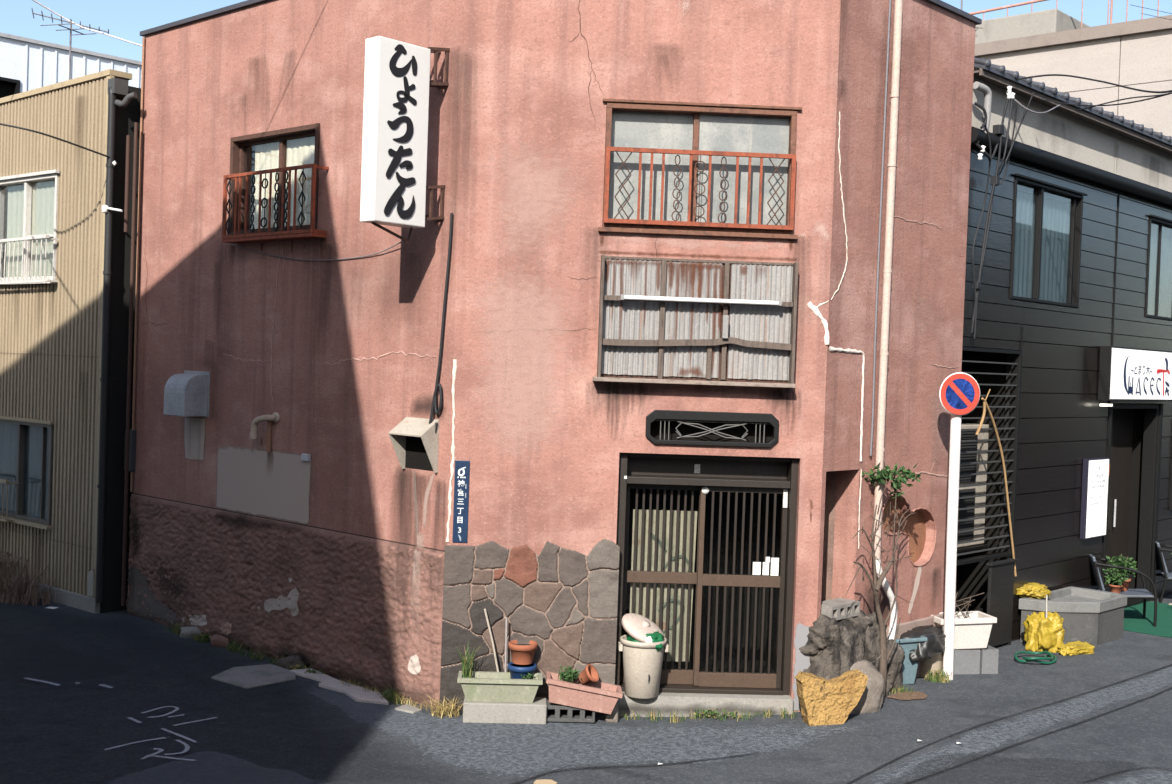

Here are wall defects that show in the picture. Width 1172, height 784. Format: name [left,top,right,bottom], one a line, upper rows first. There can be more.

crack [570,0,605,119]
corrosion [601,238,722,374]
peeling [257,577,299,616]